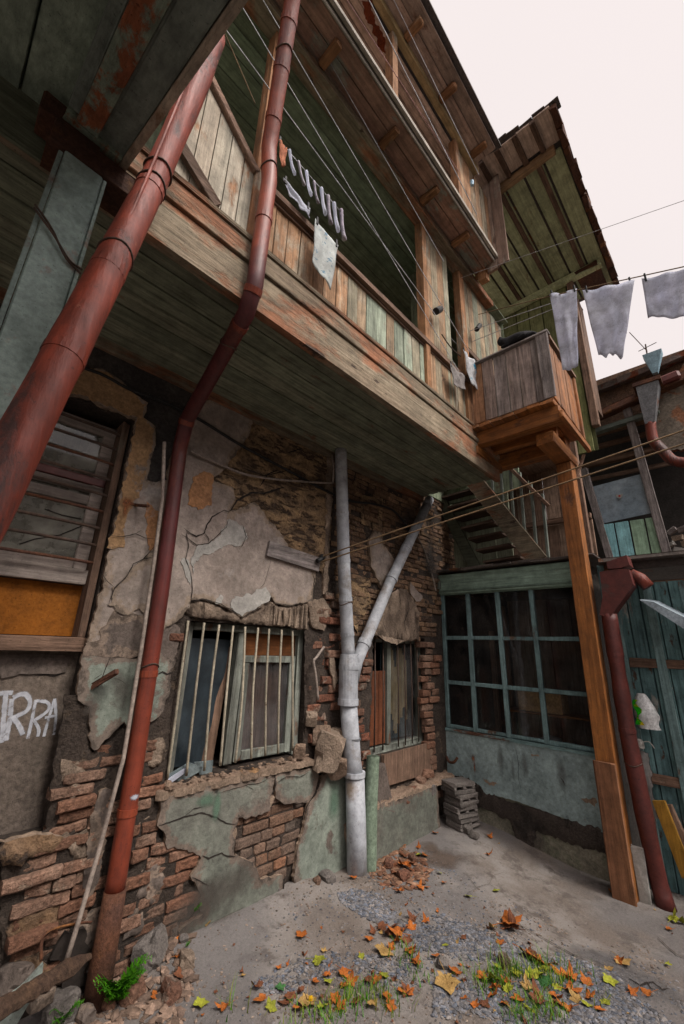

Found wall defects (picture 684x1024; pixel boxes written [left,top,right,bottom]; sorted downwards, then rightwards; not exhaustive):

peeling [71,368,160,550]
peeling [215,587,271,616]
crack [183,448,315,616]
flaking render [180,422,333,584]
flaking render [0,694,129,994]
flaking render [113,699,200,979]
crack [159,806,235,826]